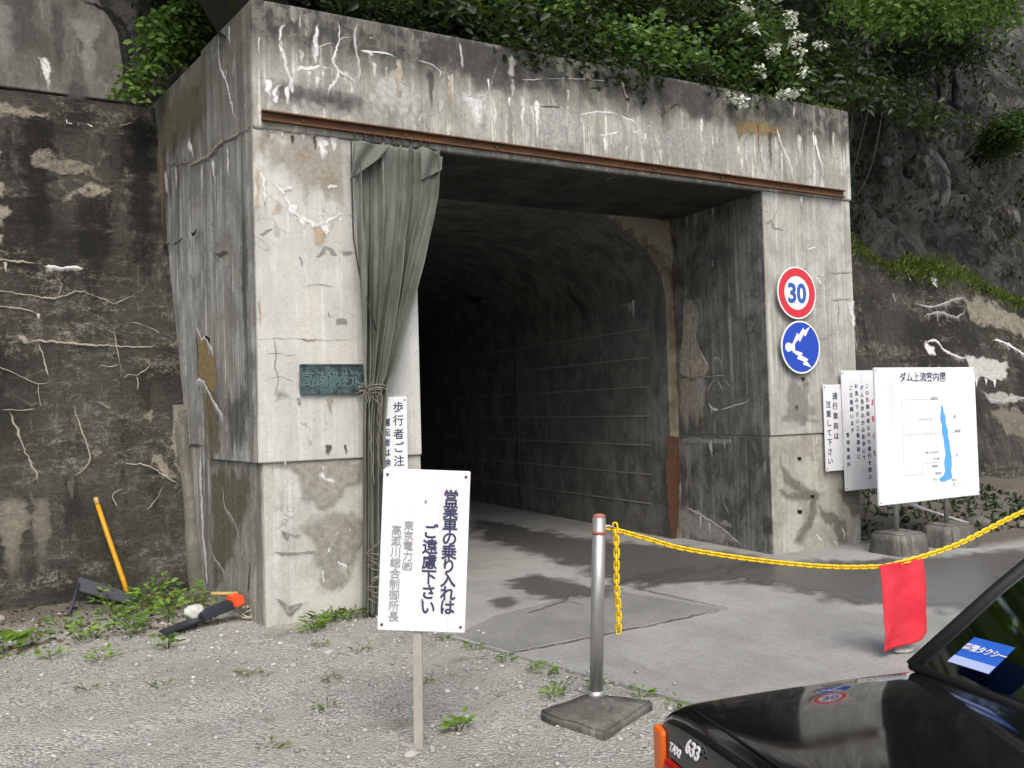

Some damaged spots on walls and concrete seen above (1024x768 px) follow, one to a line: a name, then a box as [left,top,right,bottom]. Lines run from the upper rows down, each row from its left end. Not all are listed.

leakage [0,182,12,243]
crack [163,127,250,267]
spalling [317,246,351,257]
crack [101,365,149,389]
spalling [196,329,217,393]
crack [0,367,45,478]
corrosion [665,435,681,539]
leakage [781,468,866,546]
leakage [471,519,592,572]
leakage [492,575,591,607]
leakage [604,500,898,604]
leakage [923,549,1024,612]